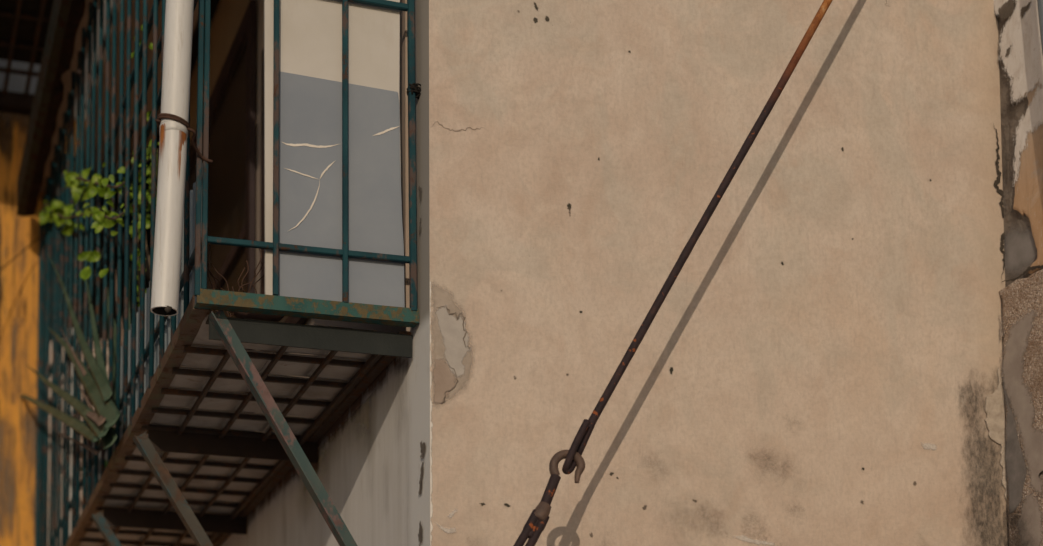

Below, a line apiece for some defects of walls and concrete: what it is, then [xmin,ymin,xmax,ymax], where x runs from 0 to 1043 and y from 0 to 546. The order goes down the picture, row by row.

water stain [0,112,30,164]
peeling [994,0,1043,185]
water stain [0,249,26,375]
spalling [431,285,472,404]
water stain [0,420,16,538]
water stain [961,385,1028,546]
spalling [985,367,1008,510]